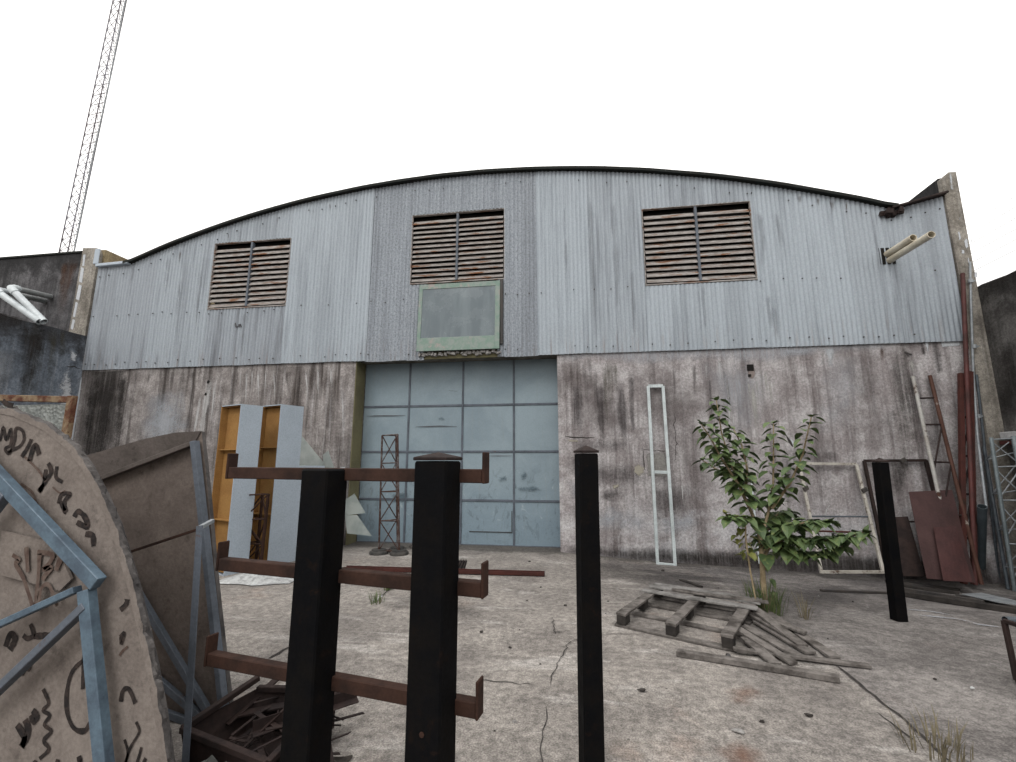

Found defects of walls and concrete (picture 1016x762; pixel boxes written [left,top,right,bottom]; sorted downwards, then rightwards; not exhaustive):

damp [85,371,125,454]
damp [194,389,215,431]
crack [488,619,574,685]
crack [540,708,548,762]